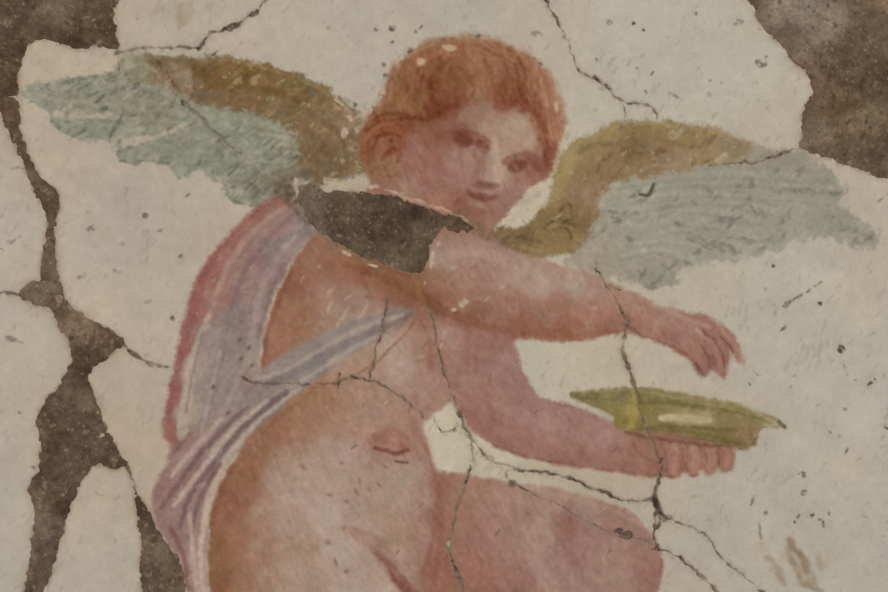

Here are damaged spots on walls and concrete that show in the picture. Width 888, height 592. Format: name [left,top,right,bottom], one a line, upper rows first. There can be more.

crack [538,0,661,126]
spalling [748,0,888,178]
spalling [249,164,550,287]
crack [0,286,21,299]
spalling [781,279,823,309]
crack [236,265,771,592]
crack [880,404,888,433]